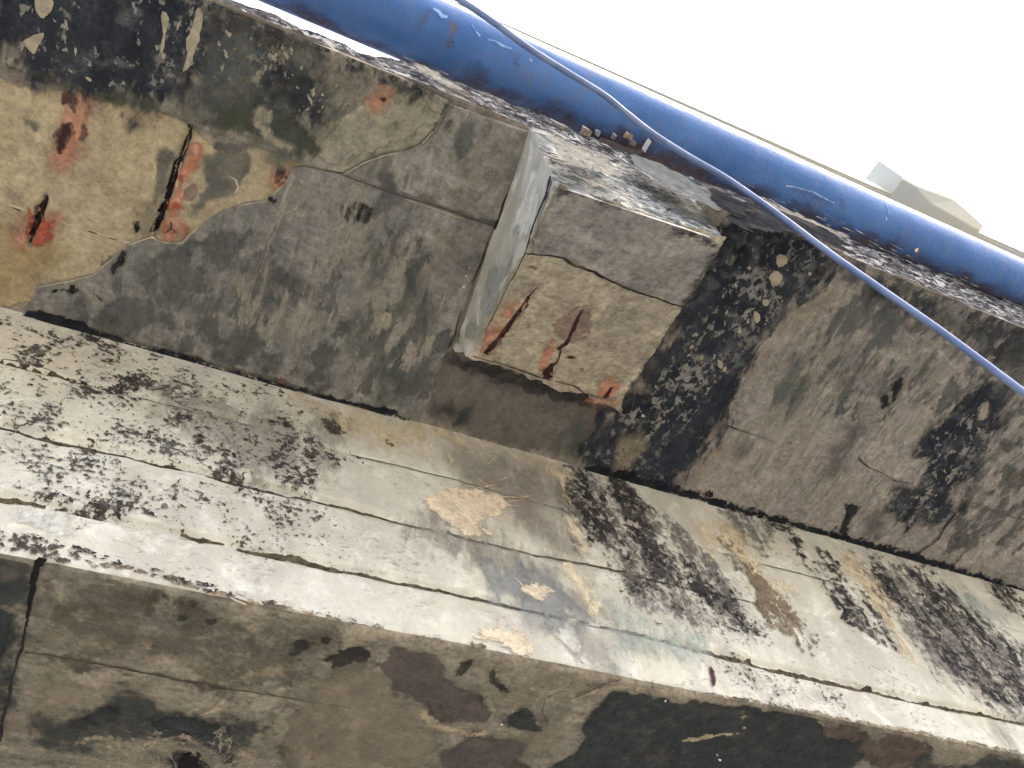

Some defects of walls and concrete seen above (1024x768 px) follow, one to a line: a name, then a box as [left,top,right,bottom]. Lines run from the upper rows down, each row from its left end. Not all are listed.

corrosion [52,90,91,171]
damp [0,0,434,210]
peeling [253,106,294,151]
spalling [149,124,202,242]
spalling [13,195,64,251]
crack [526,253,685,308]
corrosion [590,378,620,436]
damp [0,161,1024,768]
crack [858,458,908,483]
crack [919,501,1024,554]
spalling [85,560,385,630]
crack [0,557,351,742]